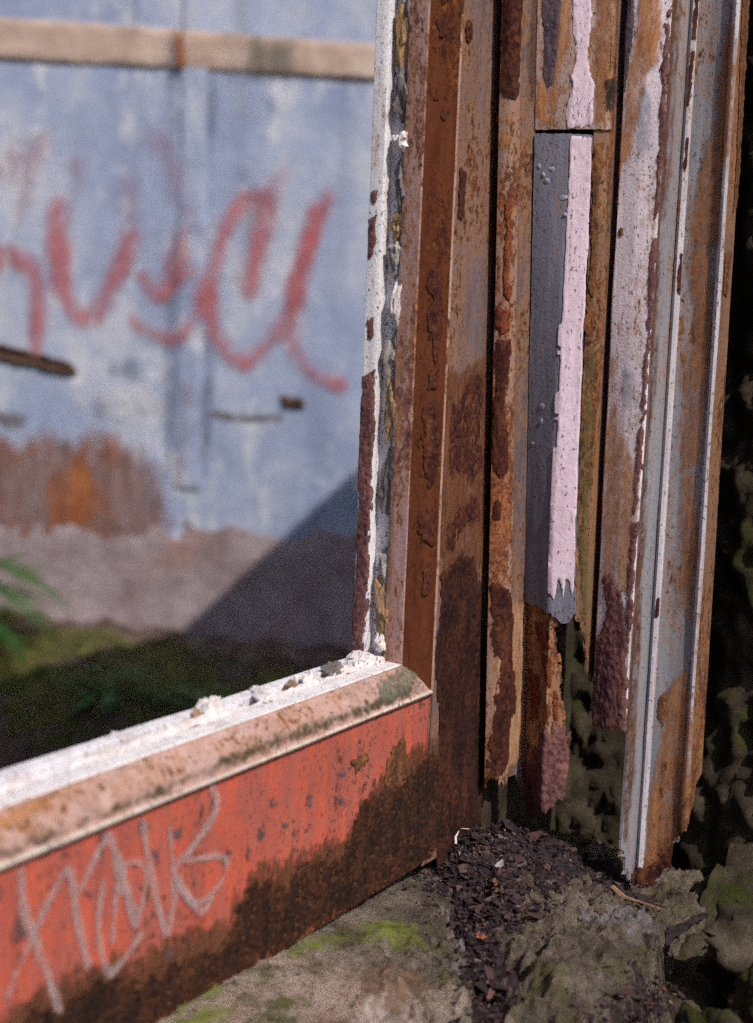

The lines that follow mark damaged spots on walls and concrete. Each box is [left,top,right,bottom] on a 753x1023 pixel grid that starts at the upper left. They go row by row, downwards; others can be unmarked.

corrosion [500,0,571,124]
peeling [623,0,634,99]
corrosion [617,0,681,219]
corrosion [367,190,378,258]
peeling [539,0,595,599]
corrosion [677,0,750,616]
corrosion [0,201,571,1023]
corrosion [631,672,700,888]
damp [362,963,440,1015]